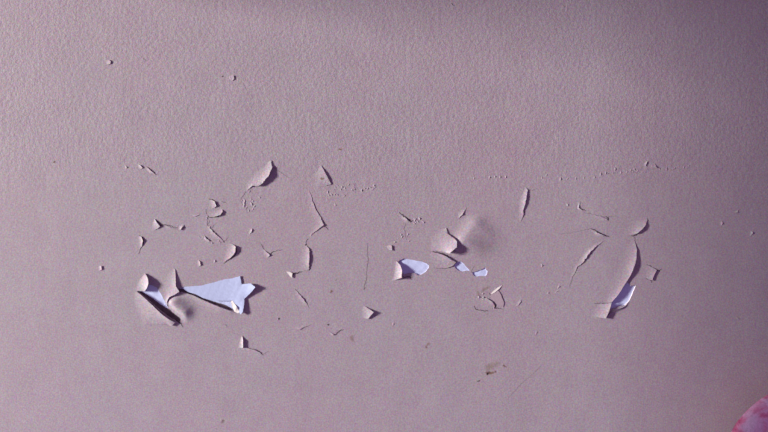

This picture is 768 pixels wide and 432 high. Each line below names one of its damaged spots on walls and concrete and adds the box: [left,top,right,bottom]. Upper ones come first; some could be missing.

peeling [241,161,286,198]
peeling [315,166,331,187]
peeling [192,199,226,218]
peeling [519,188,534,222]
peeling [213,243,237,263]
peeling [287,244,310,278]
peeling [392,228,487,281]
peeling [590,237,637,319]
peeling [134,268,255,326]
peeling [361,306,374,319]
peeling [474,286,504,311]
peeling [238,337,268,358]